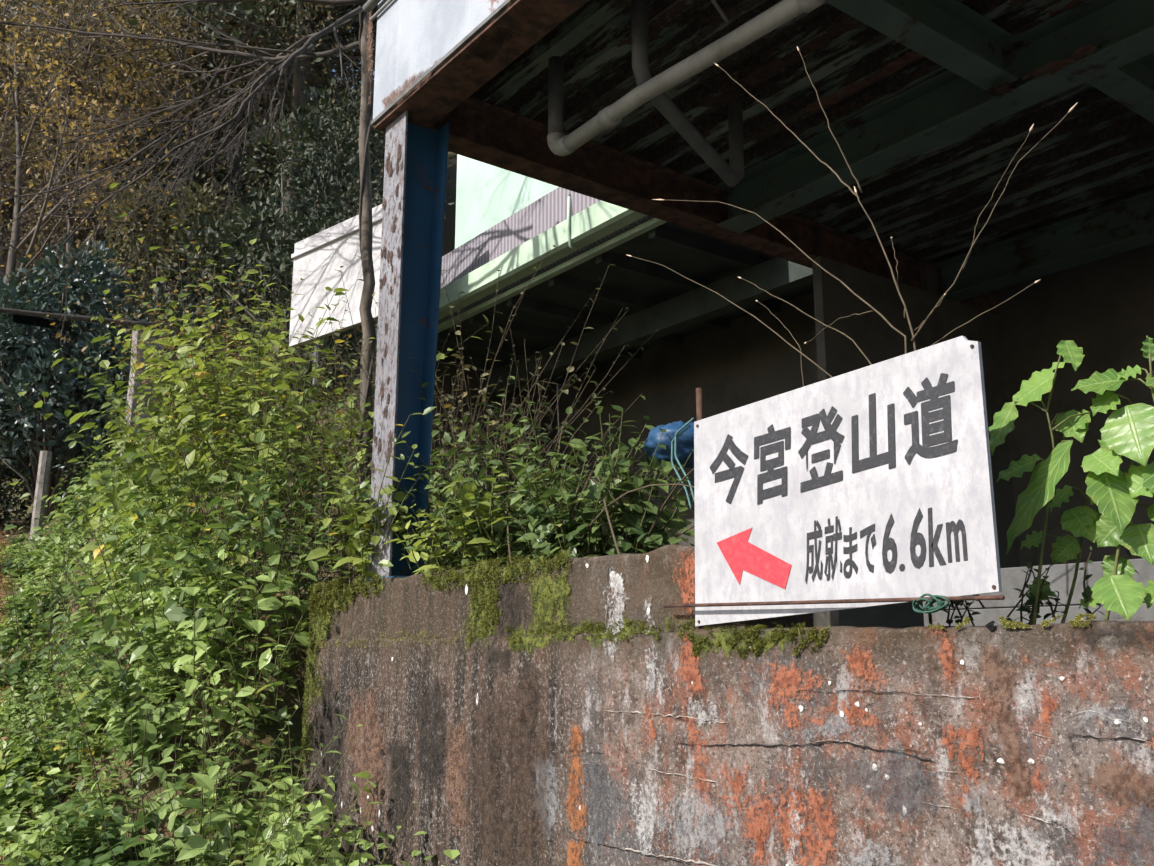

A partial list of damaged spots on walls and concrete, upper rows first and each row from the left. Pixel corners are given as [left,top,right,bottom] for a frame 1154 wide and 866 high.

rust [675,549,695,615]
water stain [307,667,352,857]
water stain [387,681,452,845]
water stain [463,568,562,866]
rust [679,629,705,696]
crack [568,710,948,782]
rust [684,716,838,866]
rust [763,662,880,735]
rust [840,646,889,690]
rust [932,626,957,682]
rust [940,724,984,817]
rust [1088,759,1154,813]